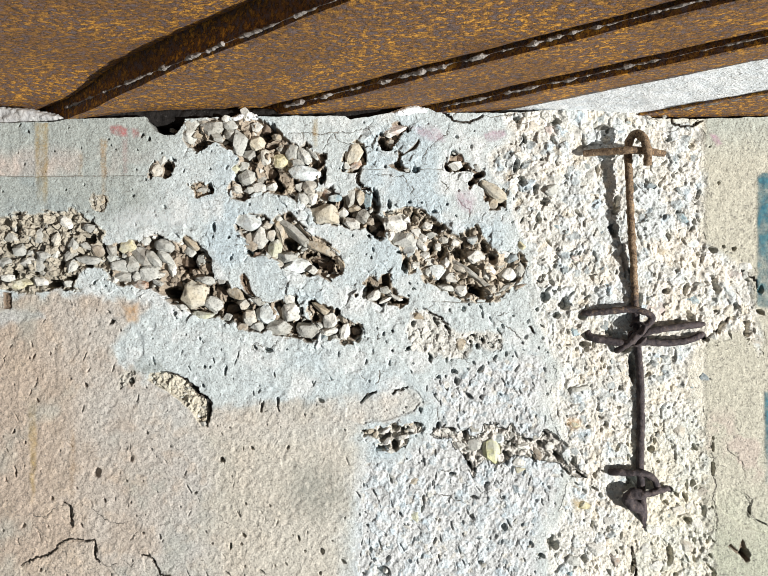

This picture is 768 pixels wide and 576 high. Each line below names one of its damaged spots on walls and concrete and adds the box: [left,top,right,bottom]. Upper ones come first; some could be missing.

peeling [148,372,211,427]
spalling [0,216,361,344]
spalling [181,107,768,576]
crack [23,502,170,576]